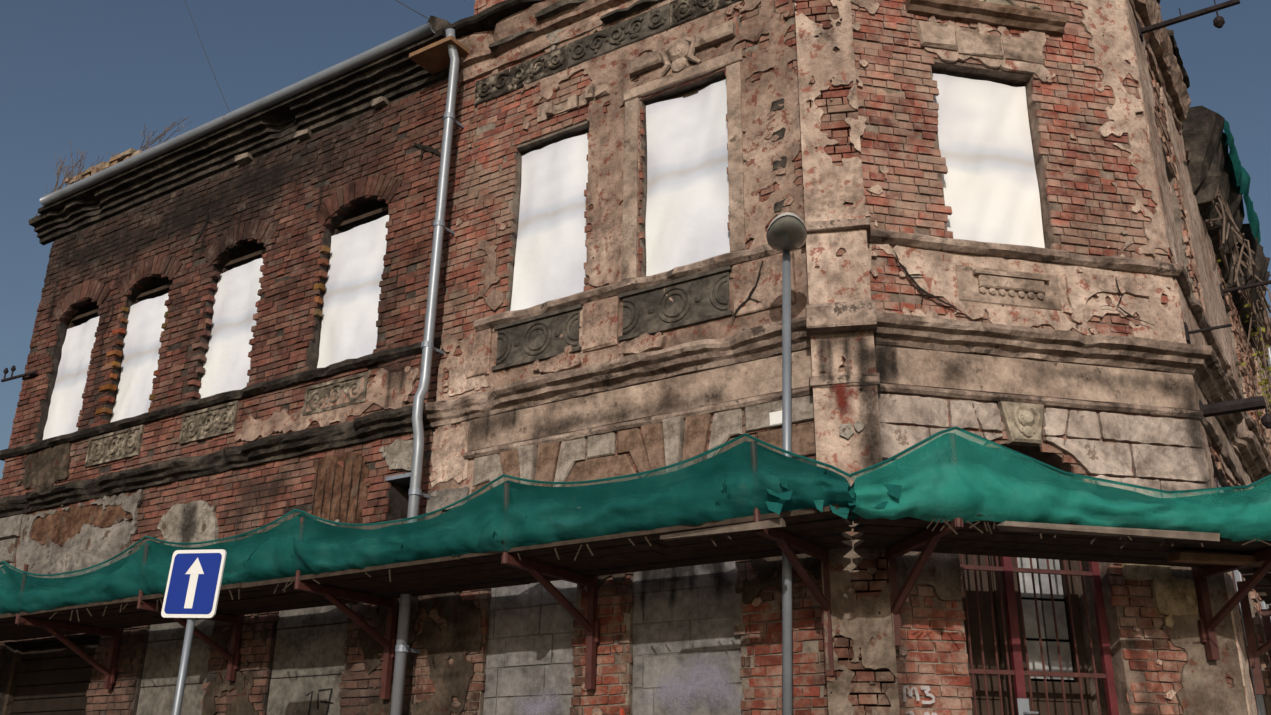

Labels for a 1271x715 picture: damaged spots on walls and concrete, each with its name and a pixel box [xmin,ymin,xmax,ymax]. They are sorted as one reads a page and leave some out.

spalling [764,98,786,142]
spalling [773,156,787,175]
spalling [774,195,794,214]
crack [893,250,961,312]
flaking render [235,366,420,442]
flaking render [379,439,413,471]
flaking render [426,425,471,513]
flaking render [15,489,144,578]
flaking render [157,500,219,548]
flaking render [1121,563,1198,628]
flaking render [1119,627,1176,715]